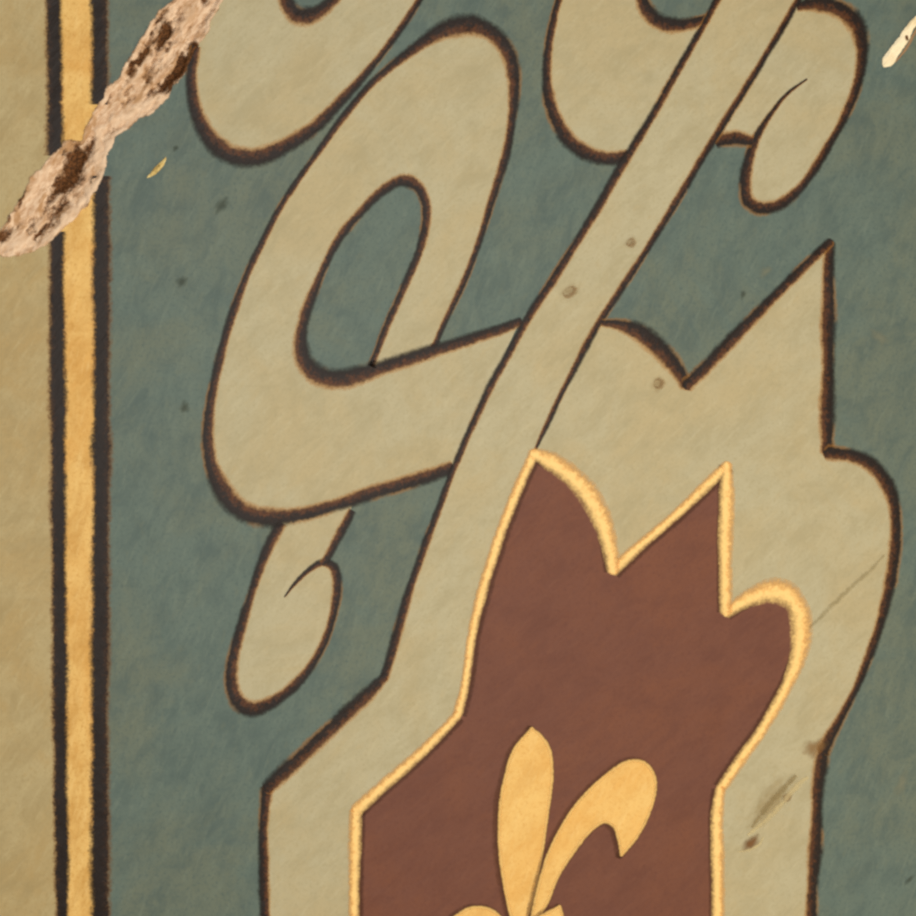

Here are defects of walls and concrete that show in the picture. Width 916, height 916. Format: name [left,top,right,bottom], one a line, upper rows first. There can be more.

peeling [882,16,916,67]
peeling [147,157,166,178]